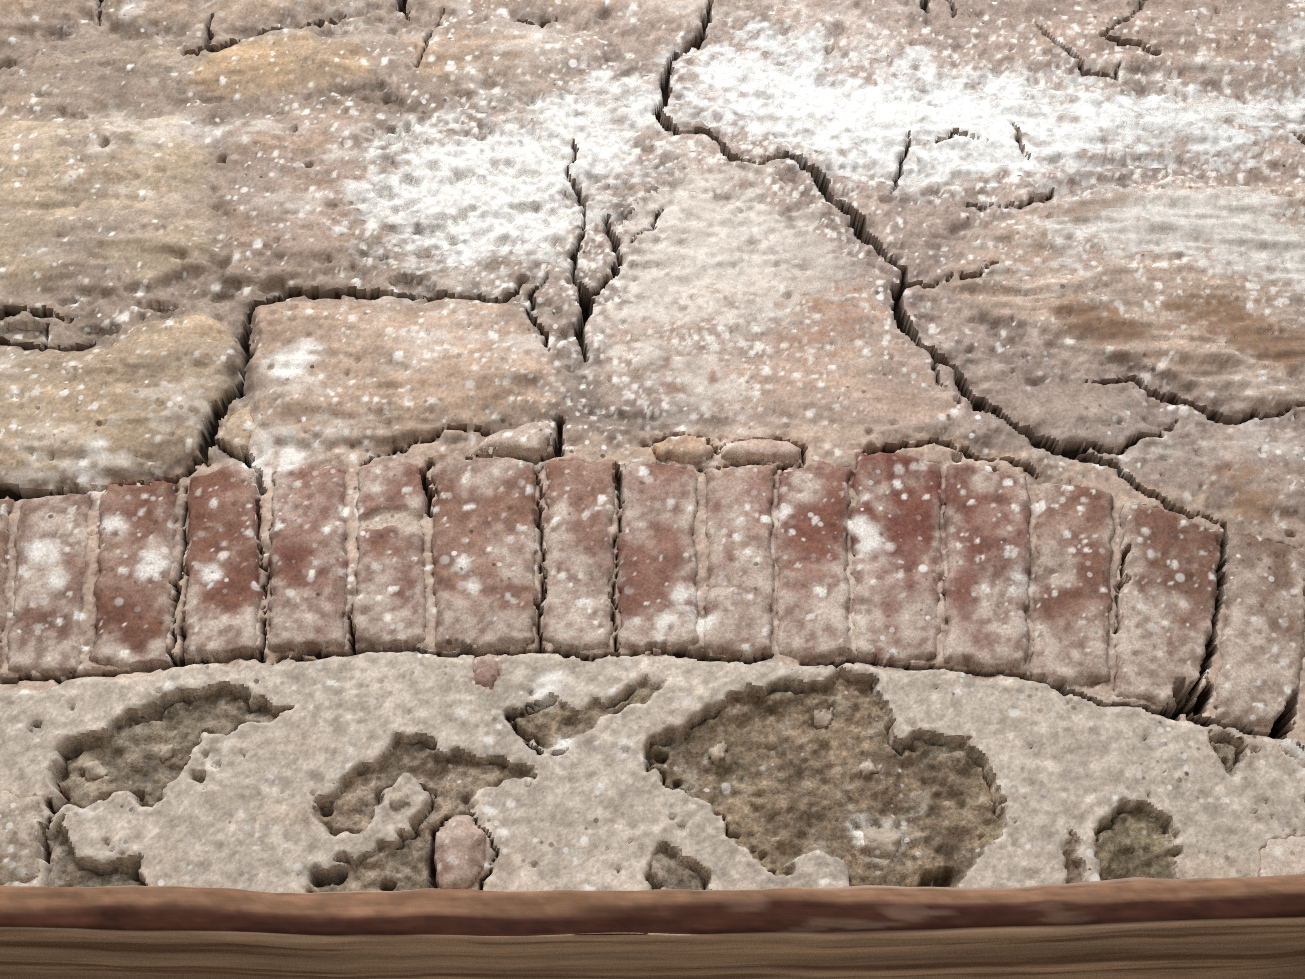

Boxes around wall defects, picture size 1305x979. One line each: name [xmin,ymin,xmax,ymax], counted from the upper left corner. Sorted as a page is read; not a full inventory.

leakage [344,19,1305,411]
crack [0,0,1305,756]
crack [45,796,58,864]
spalling [46,681,295,887]
spalling [306,732,538,893]
spalling [512,674,667,749]
spalling [647,666,1007,890]
spalling [1063,800,1184,884]